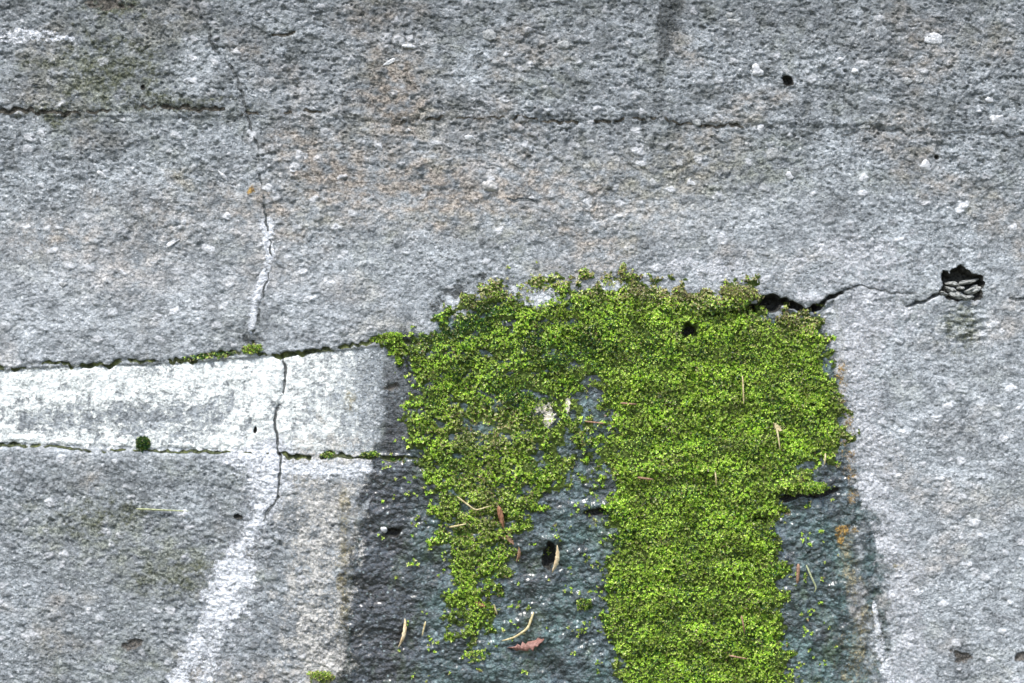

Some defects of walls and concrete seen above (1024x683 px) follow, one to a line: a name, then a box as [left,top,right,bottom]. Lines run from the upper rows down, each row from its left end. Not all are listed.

crack [0,0,437,521]
leakage [165,272,628,683]
leakage [666,253,778,291]
crack [749,284,939,313]
leakage [769,229,932,683]
spalling [939,265,985,302]